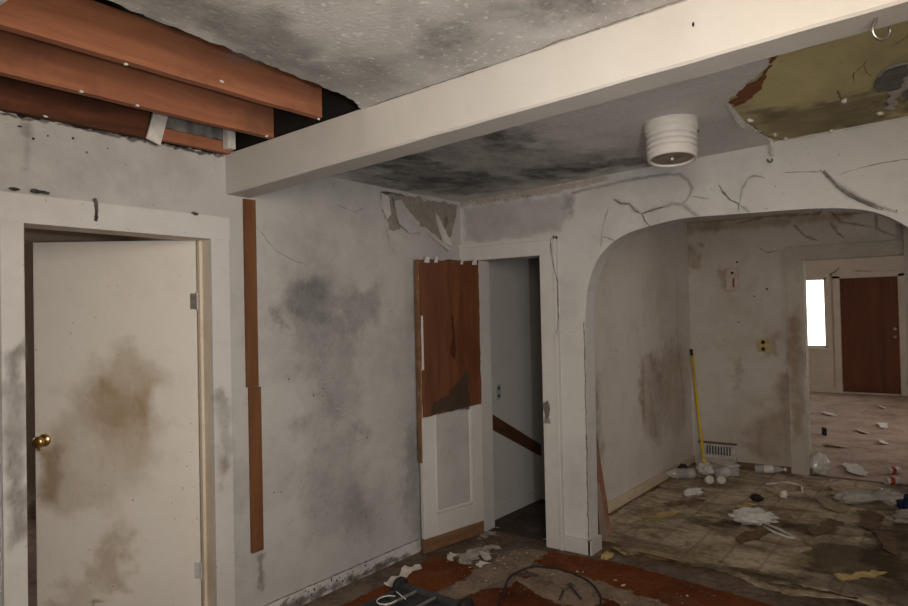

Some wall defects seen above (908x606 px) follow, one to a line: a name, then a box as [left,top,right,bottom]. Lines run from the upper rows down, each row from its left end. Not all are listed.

flaking render [874,62,908,110]
peeling [380,191,457,253]
crack [791,171,884,238]